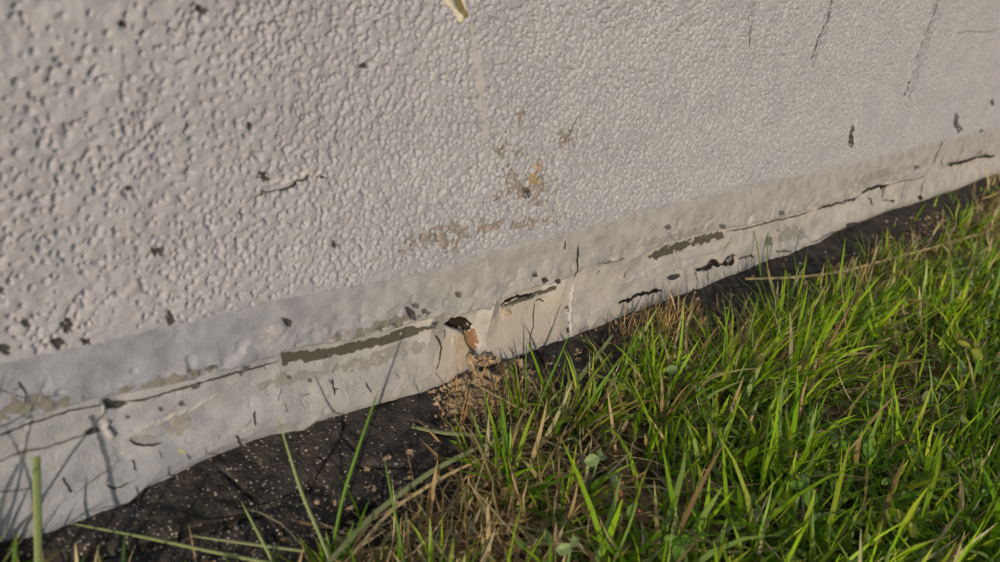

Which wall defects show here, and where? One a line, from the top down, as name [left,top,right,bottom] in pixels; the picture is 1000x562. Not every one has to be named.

peeling [443,0,470,33]
crack [258,175,327,196]
crack [817,141,996,210]
crack [564,240,662,304]
crack [695,237,791,289]
crack [435,329,446,384]
spalling [444,316,480,380]
crack [501,293,545,368]